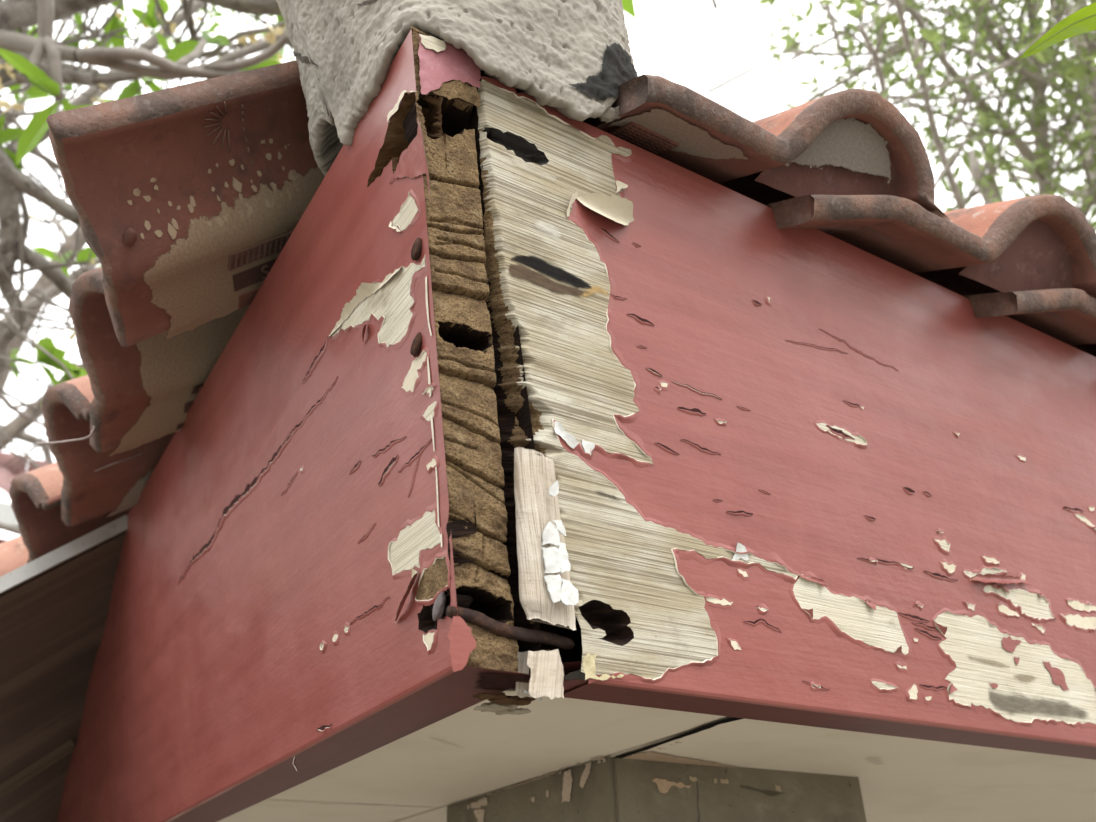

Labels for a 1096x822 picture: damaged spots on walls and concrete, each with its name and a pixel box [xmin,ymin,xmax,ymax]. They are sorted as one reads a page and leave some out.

peeling [387,90,417,122]
peeling [389,122,430,233]
peeling [329,252,428,353]
peeling [400,347,439,425]
peeling [468,76,1096,729]
crack [177,336,338,586]
crack [349,436,432,498]
peeling [426,456,440,474]
crack [358,523,376,544]
peeling [388,501,451,622]
crack [349,597,390,625]
peeling [422,629,438,655]